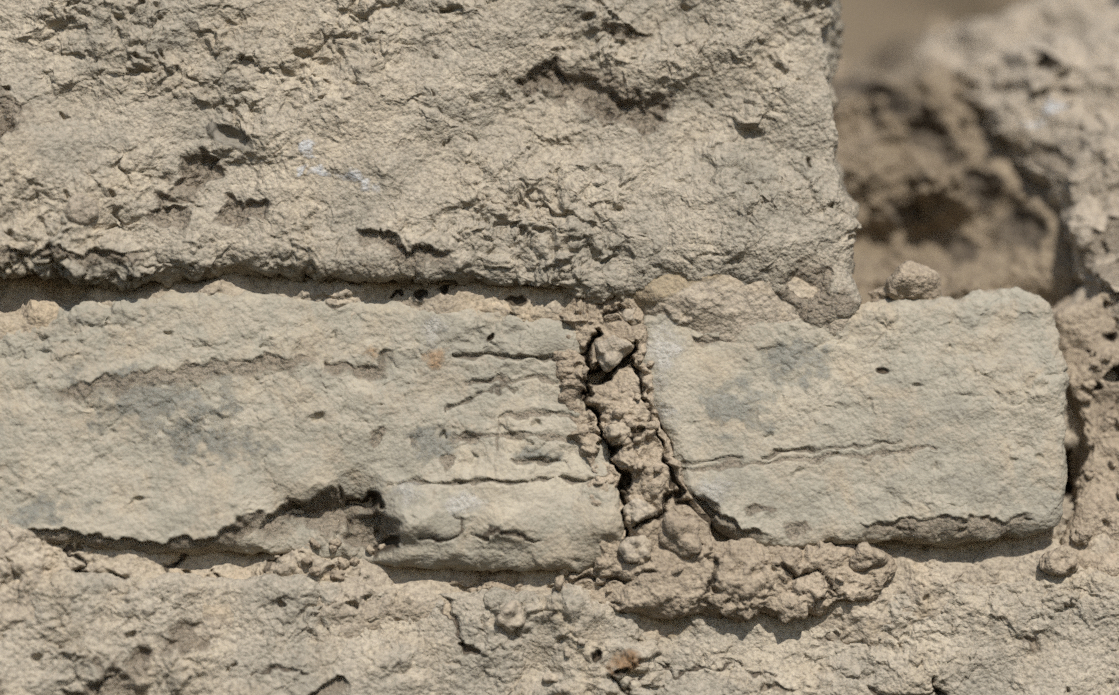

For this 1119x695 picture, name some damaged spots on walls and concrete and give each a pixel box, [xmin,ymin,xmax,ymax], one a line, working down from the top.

spalling [831,77,1048,252]
spalling [1019,142,1072,174]
spalling [942,233,981,262]
spalling [1078,217,1119,299]
crack [581,308,712,537]
crack [573,571,656,586]
crack [704,559,719,594]
crack [775,561,836,592]